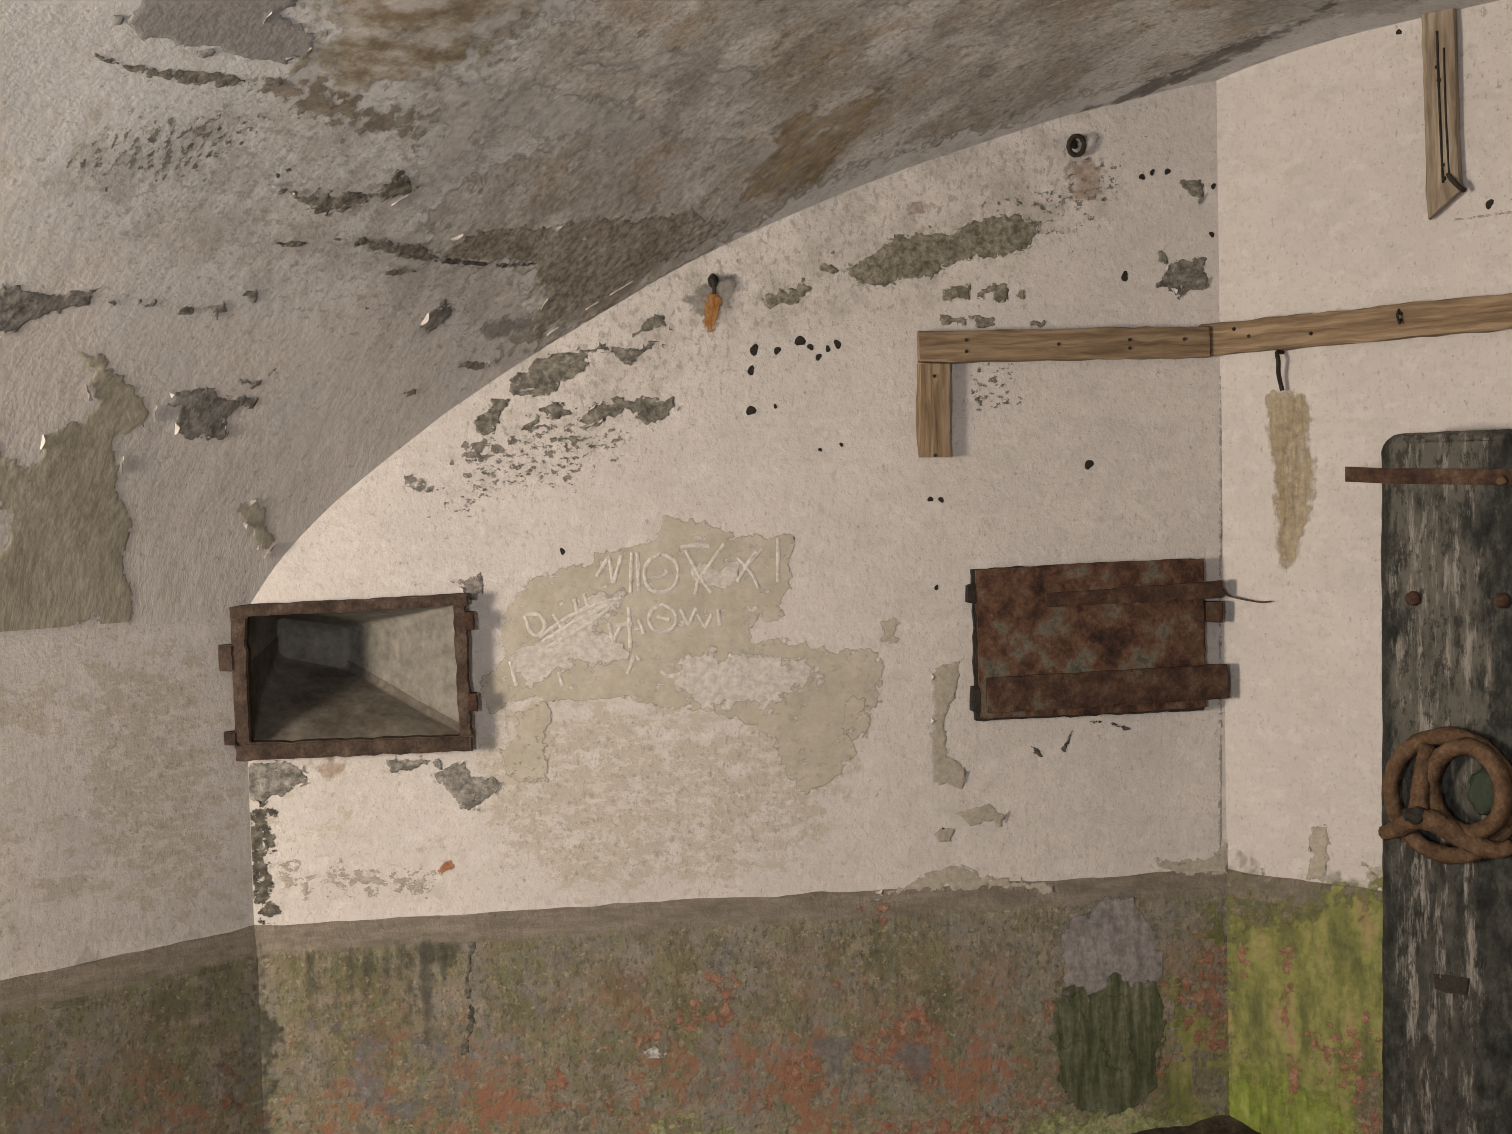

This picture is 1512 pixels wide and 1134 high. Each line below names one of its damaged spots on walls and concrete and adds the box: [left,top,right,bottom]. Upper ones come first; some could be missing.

spalling [94,0,328,88]
peeling [272,165,420,217]
peeling [0,283,117,337]
peeling [177,301,234,321]
peeling [242,289,258,303]
peeling [335,0,1319,518]
peeling [0,351,279,632]
peeling [386,516,899,811]
water stain [250,800,282,925]
water stain [408,945,457,1019]
water stain [1049,892,1166,1119]